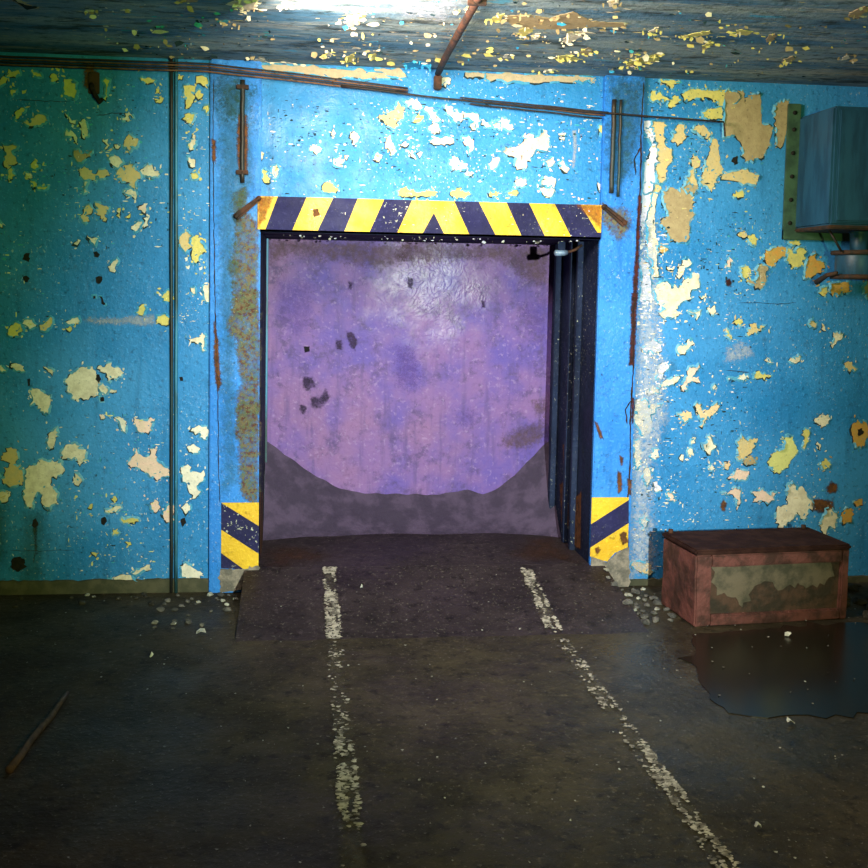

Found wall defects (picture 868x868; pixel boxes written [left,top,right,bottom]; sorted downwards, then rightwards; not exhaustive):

peeling [0,361,209,582]
peeling [0,66,210,353]
corrosion [227,187,273,557]
peeling [84,0,868,587]
corrosion [578,195,642,366]